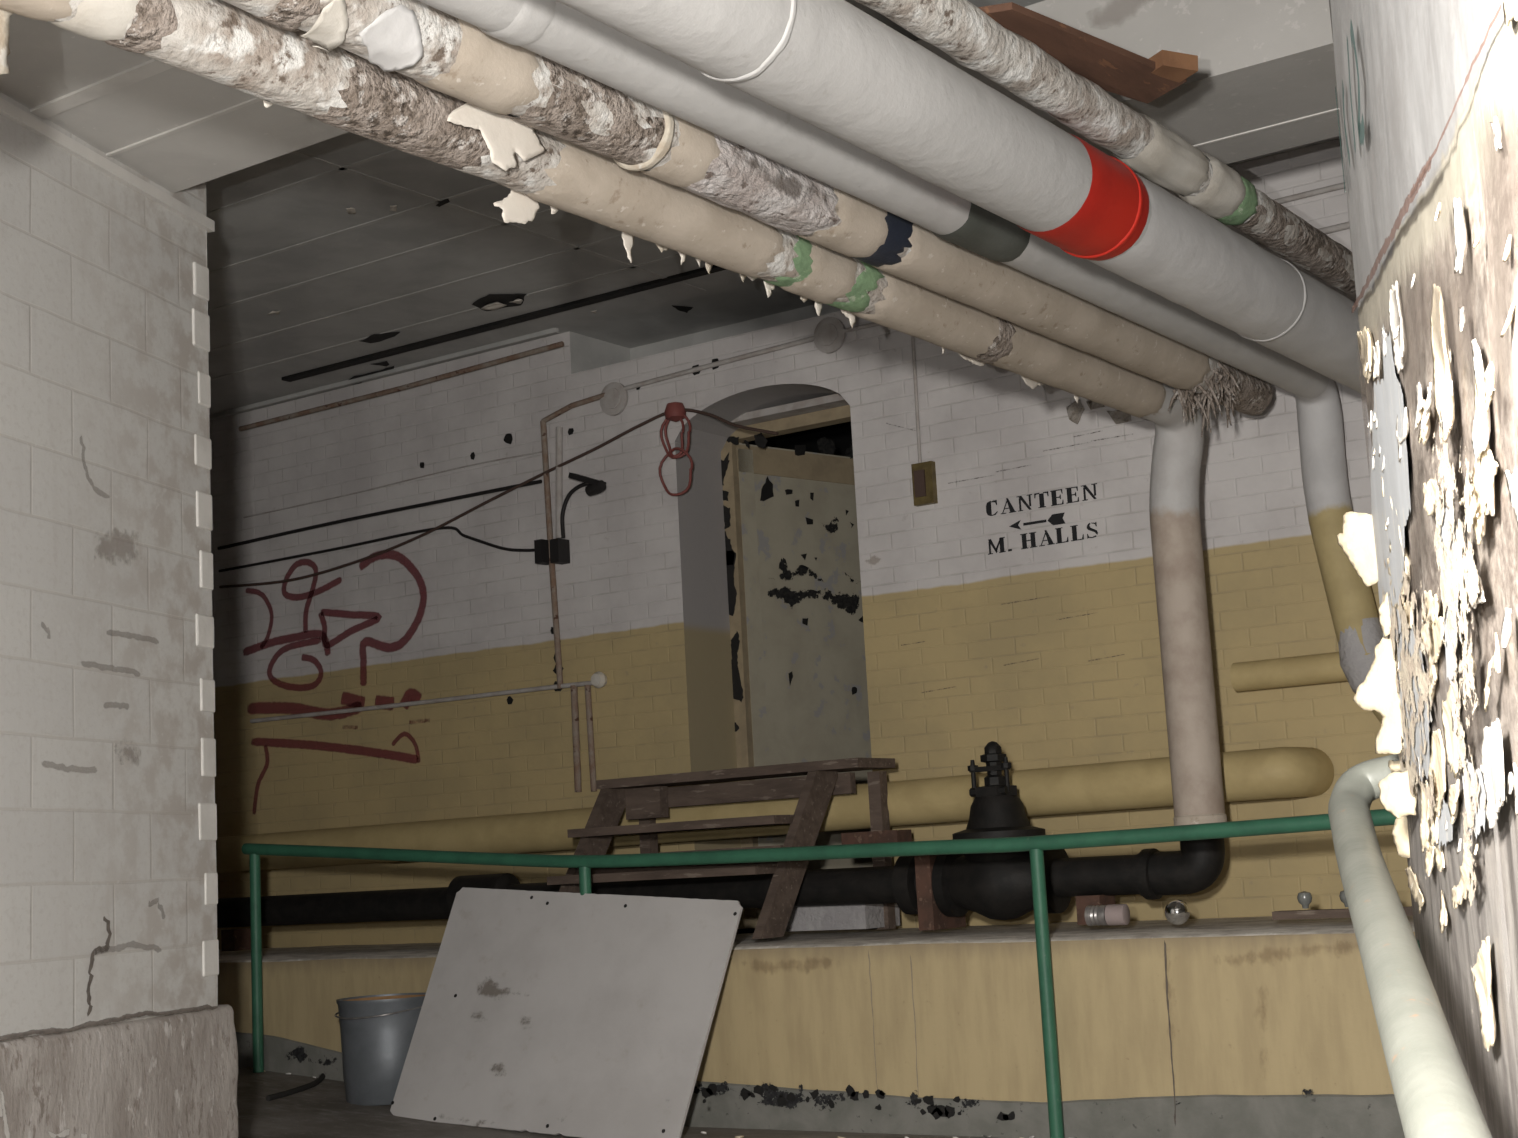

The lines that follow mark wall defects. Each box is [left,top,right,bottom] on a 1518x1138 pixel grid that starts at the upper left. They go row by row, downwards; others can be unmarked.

peeling [1490,116,1502,151]
peeling [1434,197,1480,274]
peeling [1503,234,1512,262]
peeling [1337,273,1518,934]
crack [0,916,217,1041]
peeling [1471,936,1496,1051]